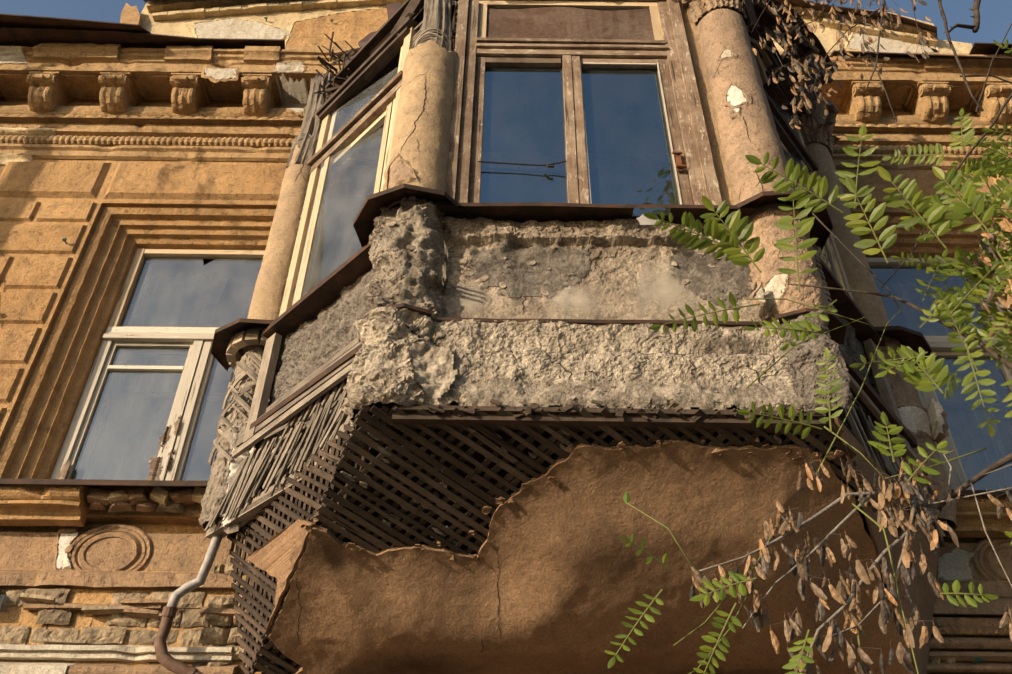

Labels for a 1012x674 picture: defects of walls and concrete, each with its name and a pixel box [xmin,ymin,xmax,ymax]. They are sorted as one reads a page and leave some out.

peeling [191,7,388,47]
peeling [201,67,242,83]
peeling [273,60,309,117]
crack [401,74,428,150]
spalling [721,81,752,118]
peeling [147,415,181,480]
spalling [301,438,844,560]
spalling [52,526,84,570]
spalling [213,562,248,575]
spalling [936,545,978,581]
spalling [0,588,256,667]